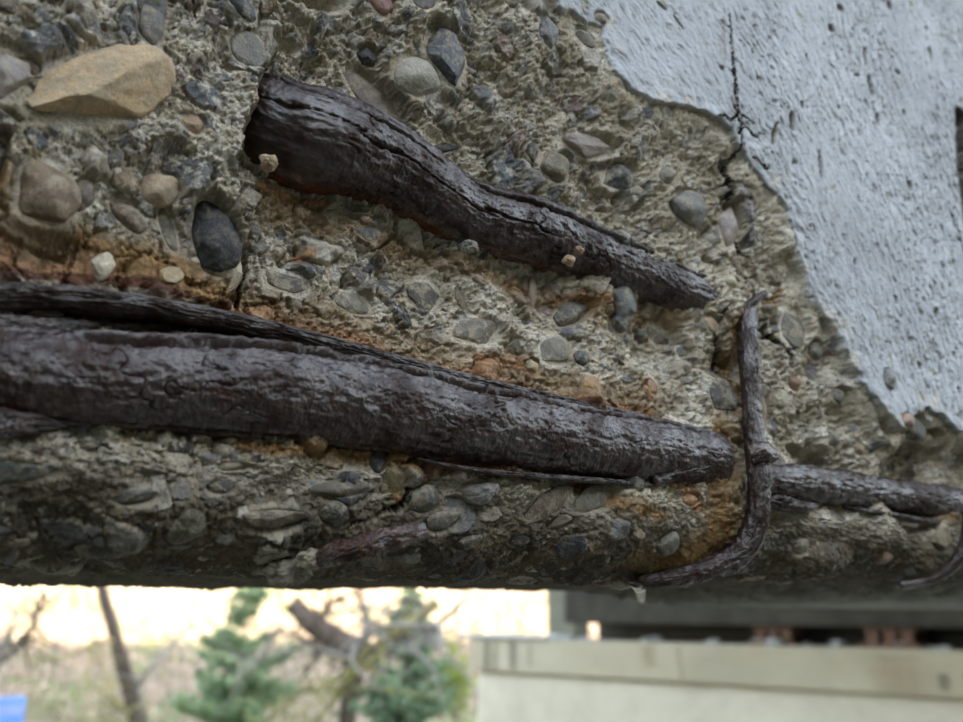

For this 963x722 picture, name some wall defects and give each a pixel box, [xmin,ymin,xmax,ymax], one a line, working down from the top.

corrosion [0,227,736,570]
spalling [0,0,761,599]
corrosion [243,72,731,314]
crack [718,14,769,207]
spalling [646,502,963,595]
corrosion [747,443,963,525]
spalling [753,180,963,488]